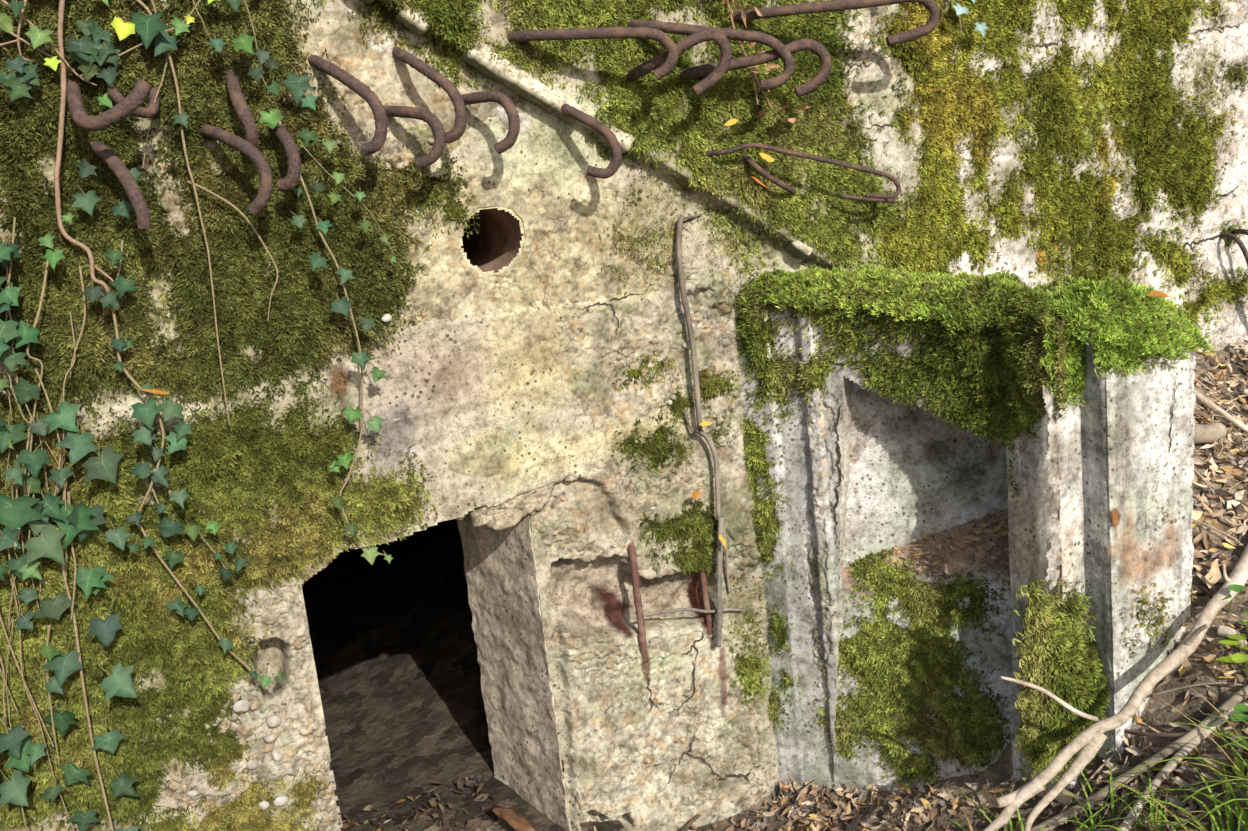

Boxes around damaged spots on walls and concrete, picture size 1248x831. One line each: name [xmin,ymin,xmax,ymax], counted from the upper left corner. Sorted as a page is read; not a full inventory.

spalling [386,174,766,831]
crack [833,398,844,544]
corrosion [1111,508,1120,535]
corrosion [593,585,633,637]
corrosion [688,568,714,638]
corrosion [642,652,651,681]
crack [647,627,762,784]
corrosion [719,648,727,705]